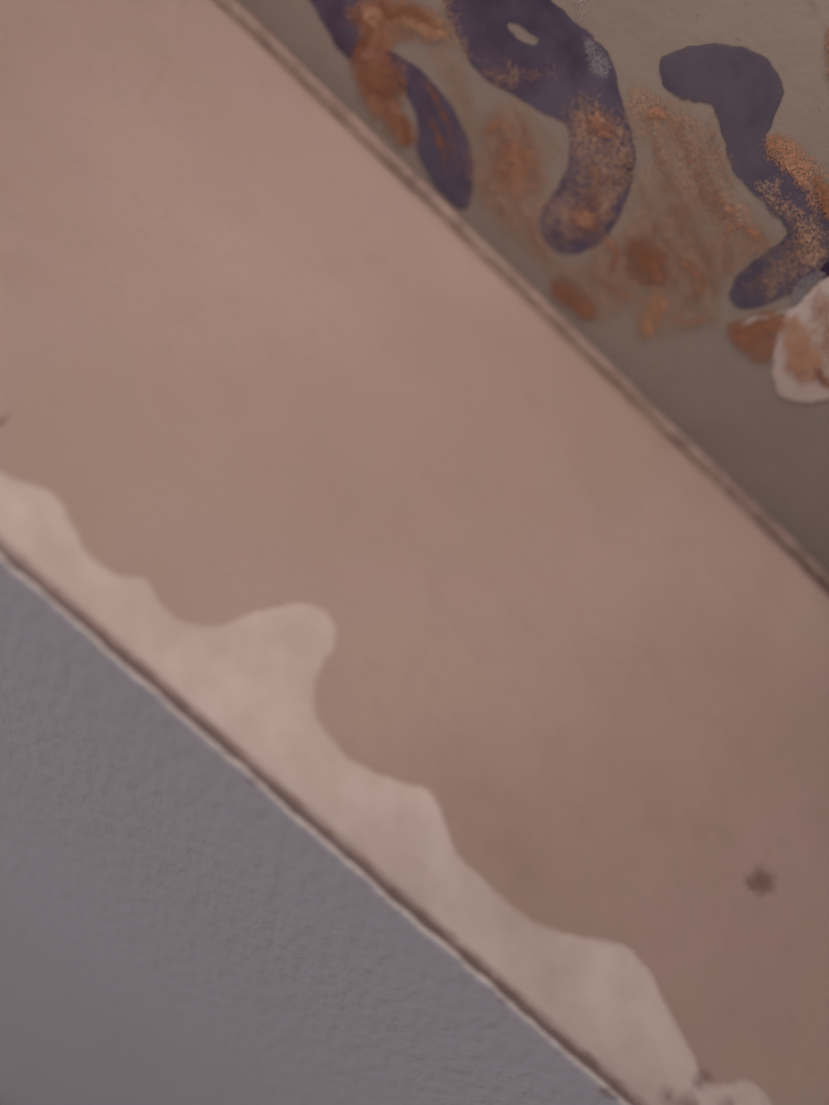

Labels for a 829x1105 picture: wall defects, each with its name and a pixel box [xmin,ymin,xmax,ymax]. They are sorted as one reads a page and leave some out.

corrosion [723,130,829,366]
peeling [771,276,829,403]